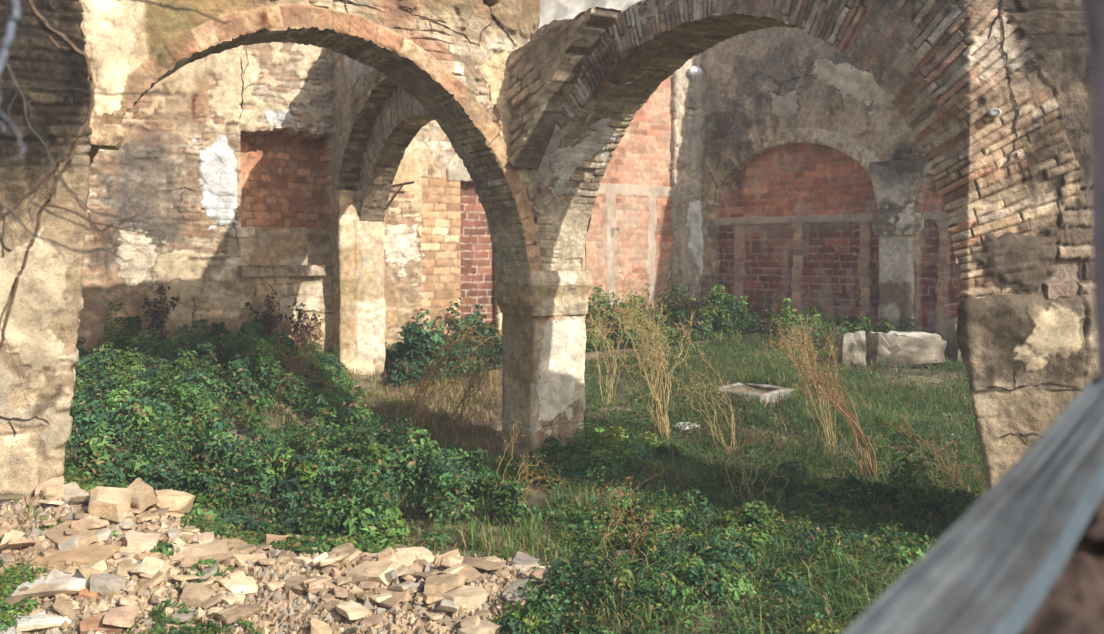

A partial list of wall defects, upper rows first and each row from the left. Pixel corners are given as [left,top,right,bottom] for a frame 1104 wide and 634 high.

crack [333,0,517,53]
crack [988,0,1027,192]
peeling [191,126,237,230]
peeling [680,192,704,277]
spalling [973,222,1063,295]
peeling [1013,303,1083,371]
crack [987,372,1082,391]